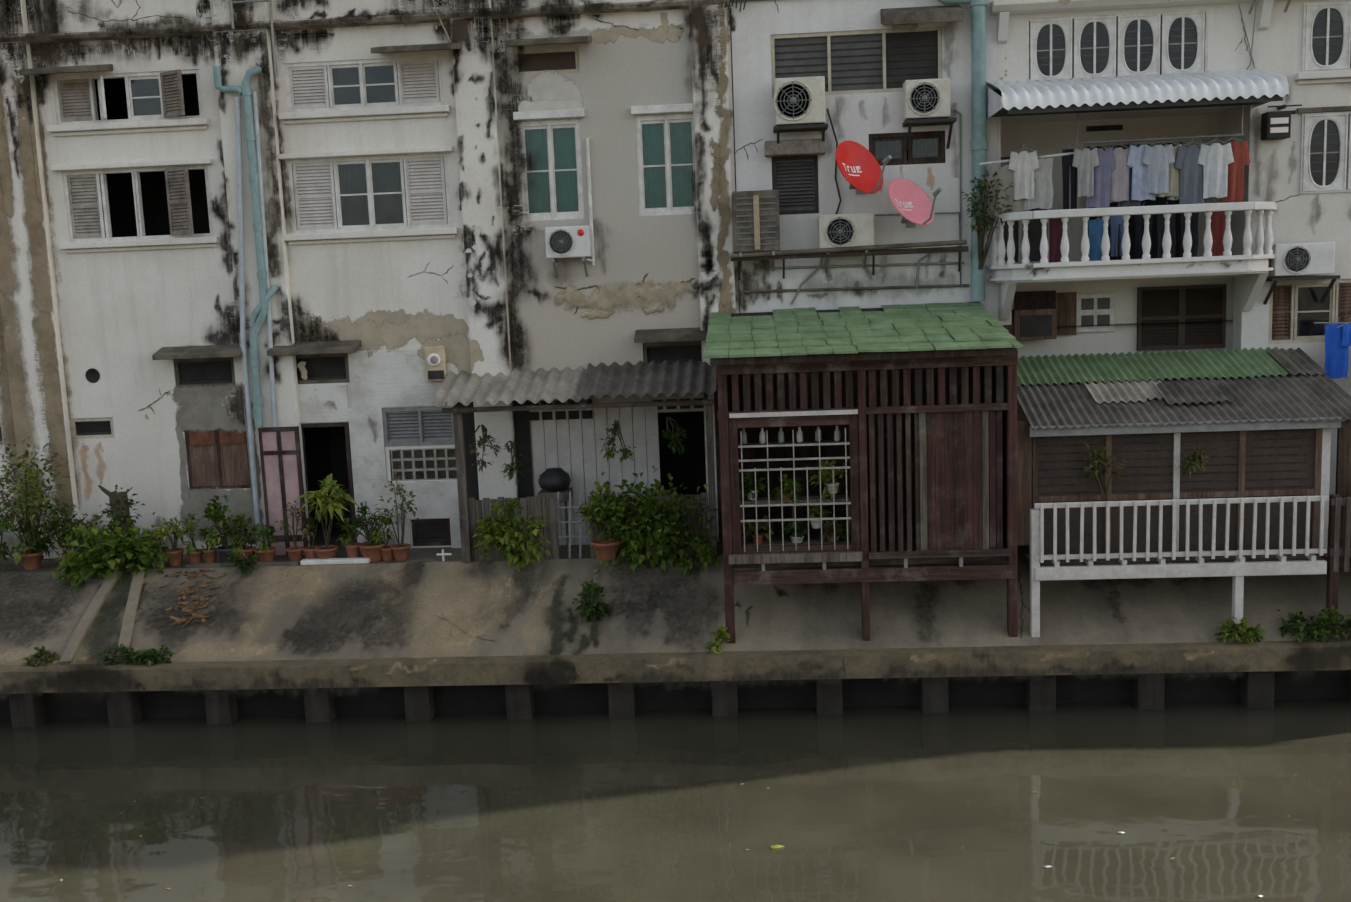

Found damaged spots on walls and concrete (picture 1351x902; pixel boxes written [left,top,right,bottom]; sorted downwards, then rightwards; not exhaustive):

water stain [540,0,613,36]
peeling [590,13,683,45]
water stain [686,0,746,331]
water stain [98,0,547,383]
peeling [297,225,509,374]
water stain [762,260,782,302]
peeling [297,361,307,380]